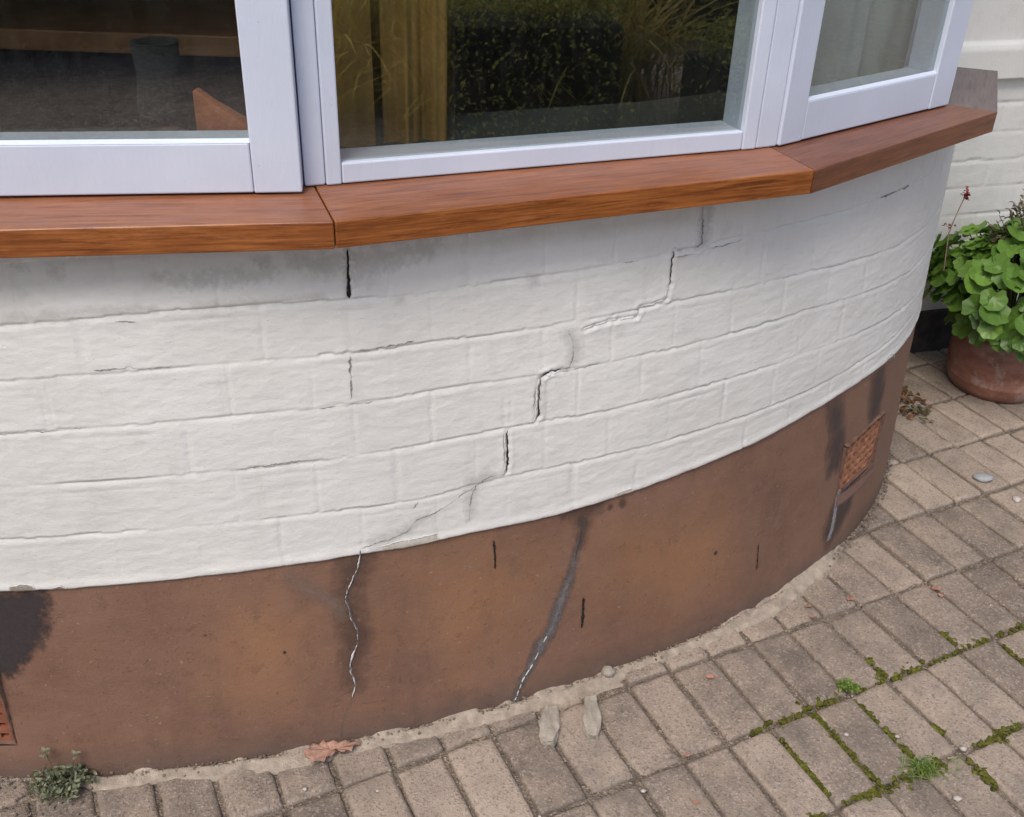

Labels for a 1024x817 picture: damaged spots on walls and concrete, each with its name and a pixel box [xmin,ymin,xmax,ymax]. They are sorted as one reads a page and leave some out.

water stain [0,590,51,677]
crack [320,206,740,738]